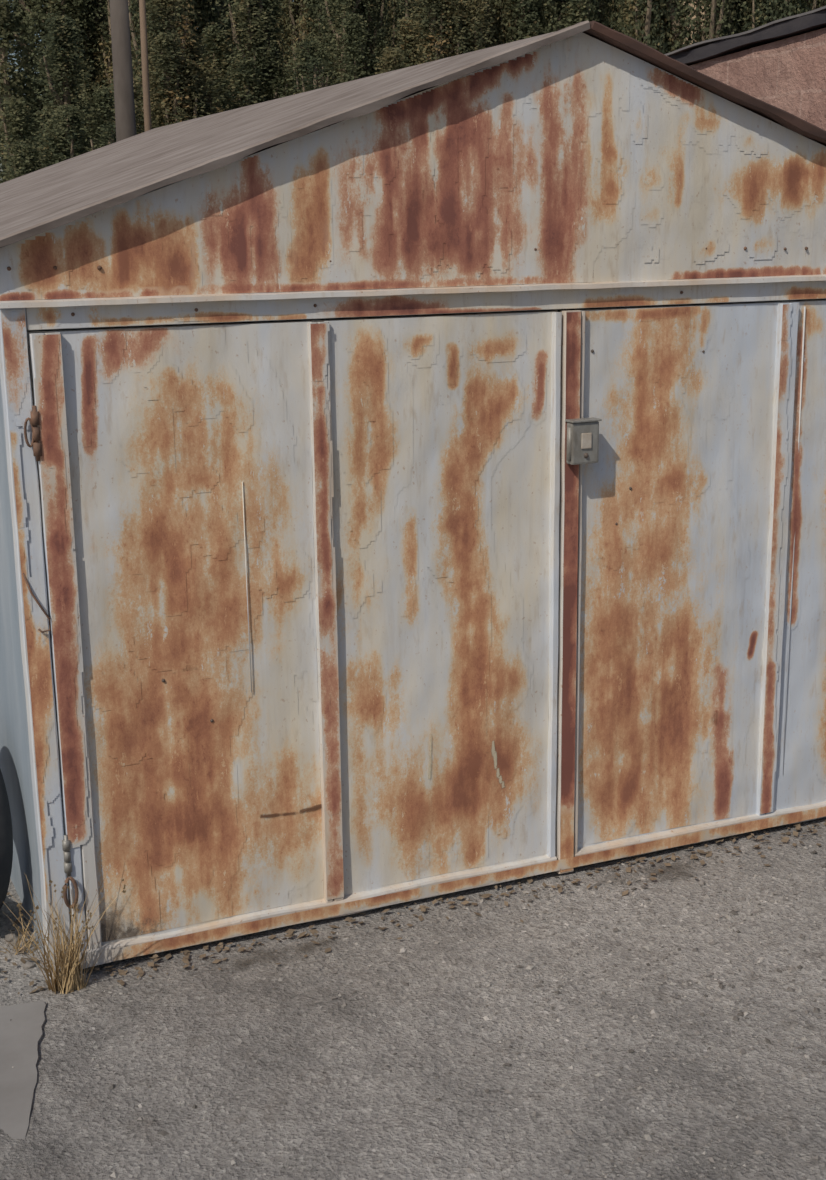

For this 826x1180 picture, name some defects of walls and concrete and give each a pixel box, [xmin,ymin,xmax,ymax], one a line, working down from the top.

rust [0,34,826,963]